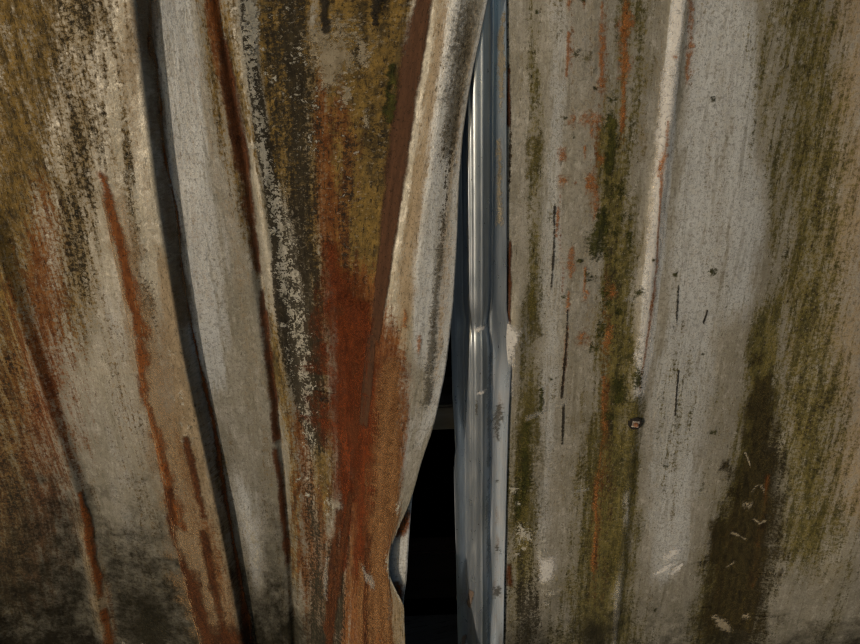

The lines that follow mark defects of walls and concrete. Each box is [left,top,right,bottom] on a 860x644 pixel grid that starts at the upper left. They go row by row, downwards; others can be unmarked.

damp [319,0,331,33]
rust [78,492,102,598]
rust [98,0,261,644]
rust [259,290,290,564]
rust [301,0,431,644]
rust [641,121,669,370]